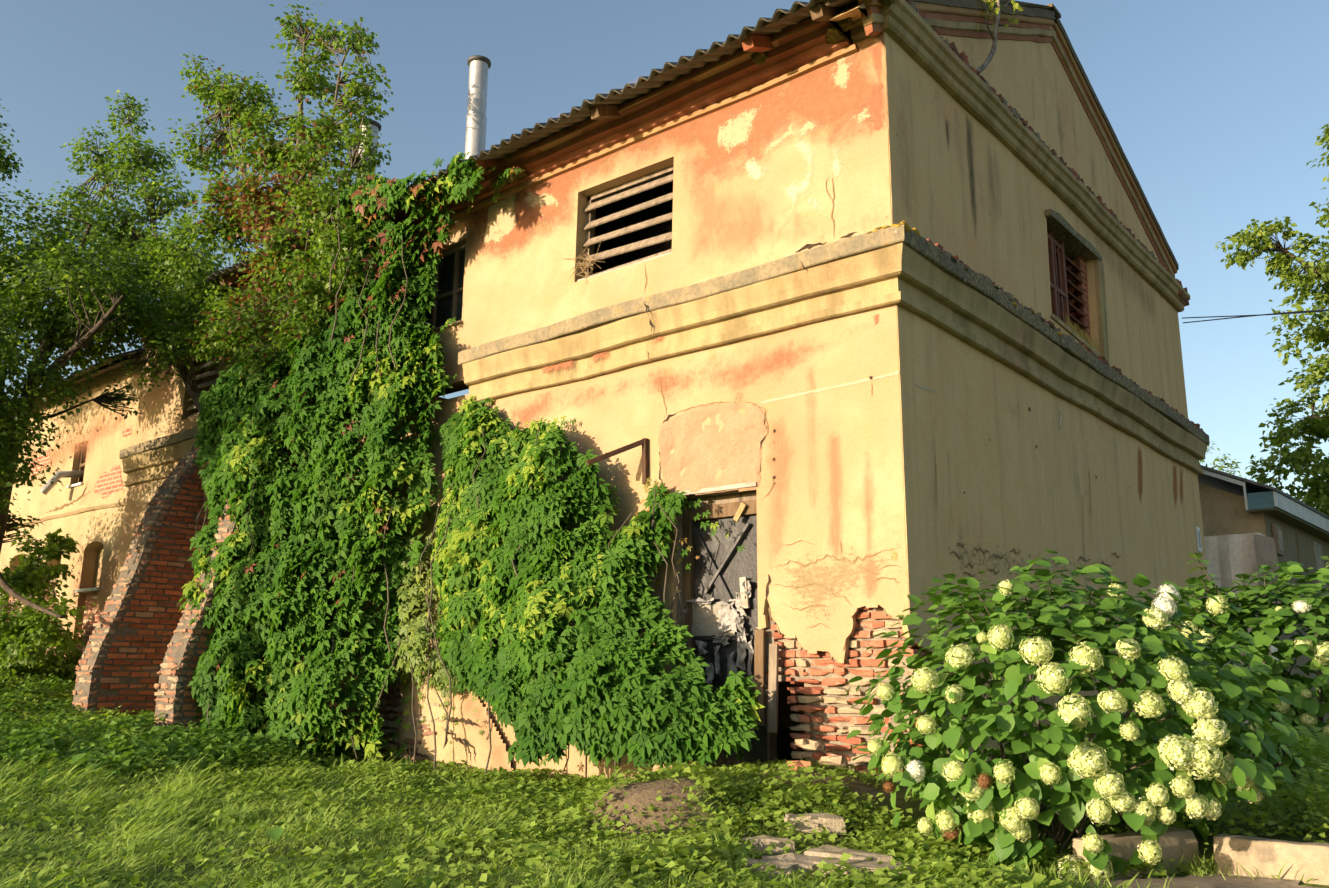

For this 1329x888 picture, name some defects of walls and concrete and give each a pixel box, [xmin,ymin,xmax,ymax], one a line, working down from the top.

peeling [472,53,882,252]
damp [968,122,976,216]
spalling [31,425,107,476]
spalling [94,465,123,498]
corrosion [1173,466,1183,502]
crack [766,540,900,629]
spalling [763,599,934,789]